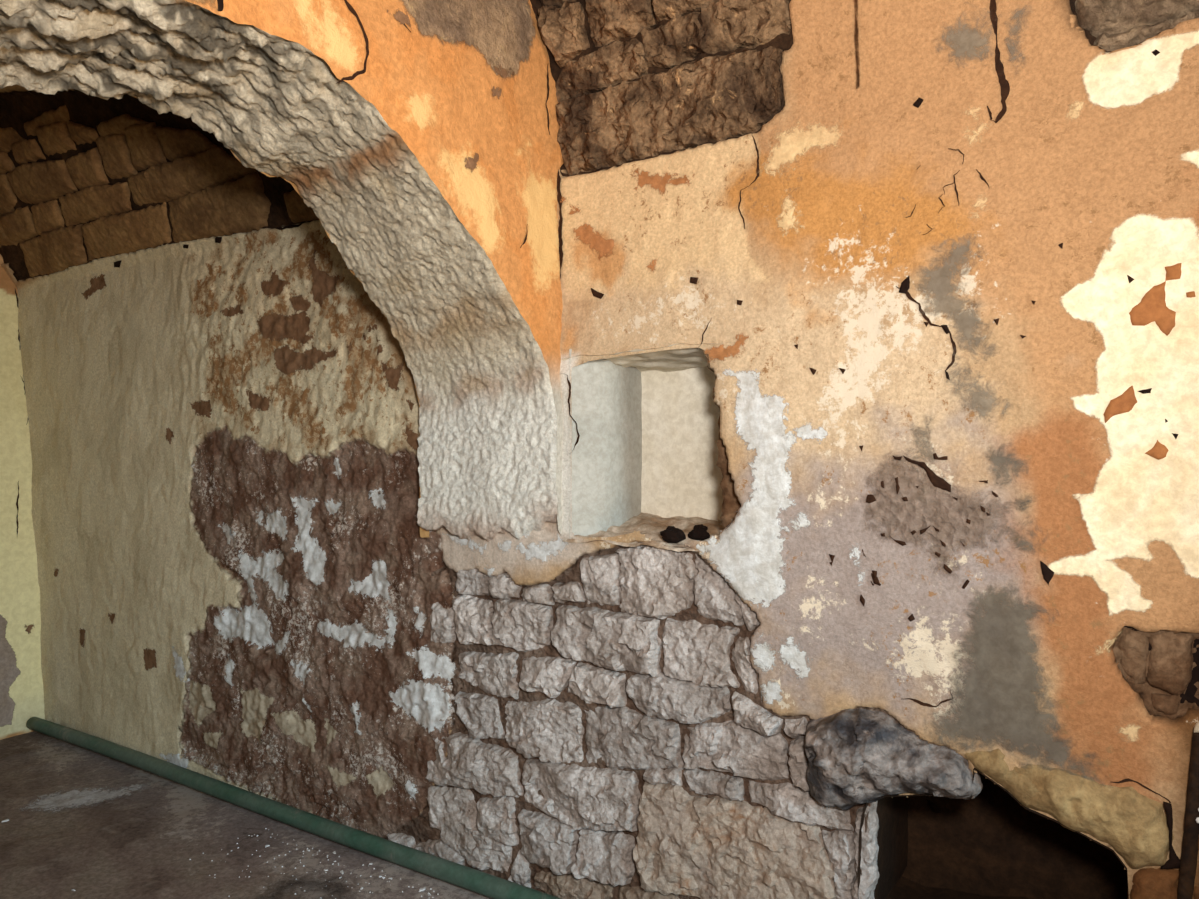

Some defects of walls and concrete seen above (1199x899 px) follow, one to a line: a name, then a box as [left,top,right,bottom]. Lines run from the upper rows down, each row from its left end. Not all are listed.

crack [216,0,224,11]
crack [336,0,369,84]
crack [544,63,552,134]
spalling [387,0,842,193]
crack [987,0,1010,123]
peeling [1067,0,1199,118]
peeling [257,250,414,411]
crack [896,286,957,371]
spalling [866,453,1004,574]
peeling [1049,214,1199,733]
peeling [0,614,21,727]
spalling [159,333,881,899]